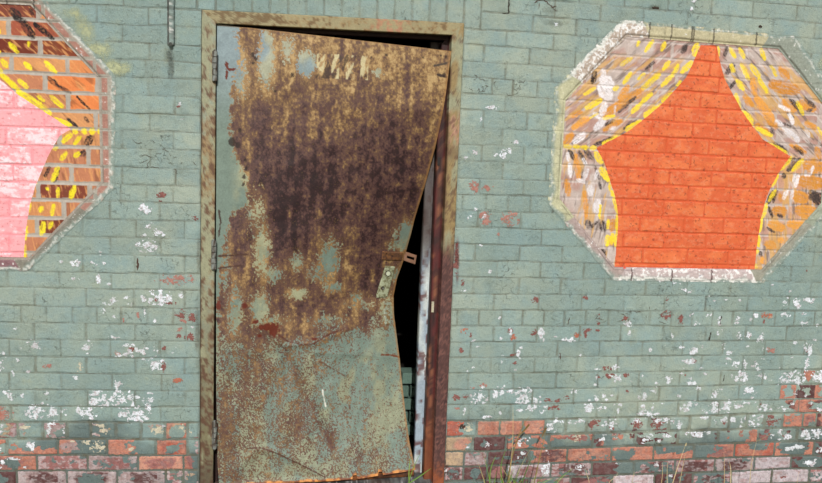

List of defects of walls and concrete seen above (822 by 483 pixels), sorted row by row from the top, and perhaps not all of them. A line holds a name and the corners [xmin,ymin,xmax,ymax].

peeling [467,207,520,227]
peeling [102,275,196,341]
peeling [111,335,174,371]
peeling [444,290,822,483]
peeling [0,380,199,483]